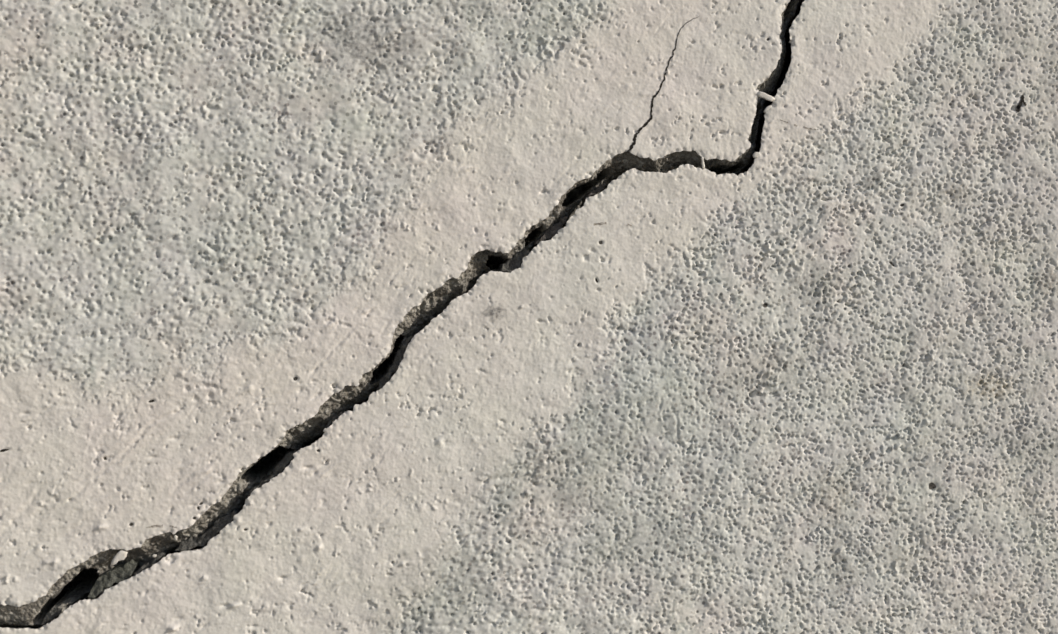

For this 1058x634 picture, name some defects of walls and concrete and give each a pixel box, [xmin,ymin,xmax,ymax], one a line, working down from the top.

crack [0,0,818,628]